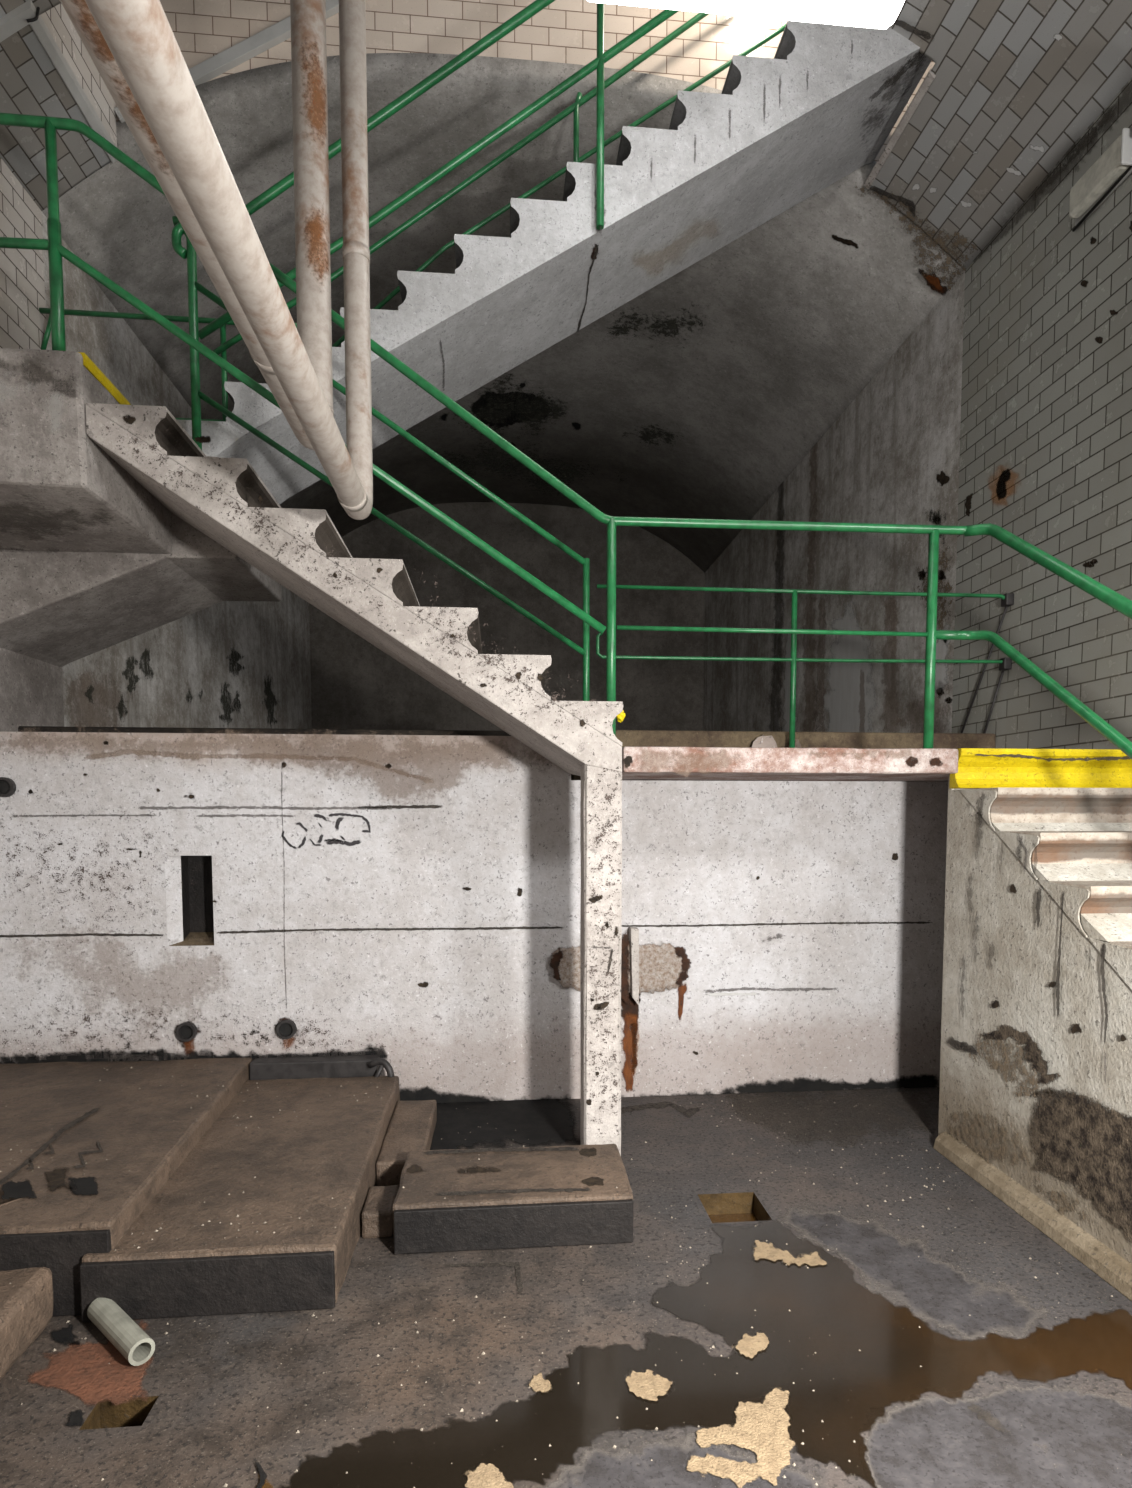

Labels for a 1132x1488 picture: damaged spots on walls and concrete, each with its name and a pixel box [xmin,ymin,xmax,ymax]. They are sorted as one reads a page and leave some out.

crack [577,226,602,332]
corrosion [990,467,1016,505]
water stain [117,648,154,720]
water stain [219,648,244,726]
water stain [262,675,279,728]
corrosion [550,946,580,991]
corrosion [621,927,691,1091]
spalling [942,1024,1132,1243]